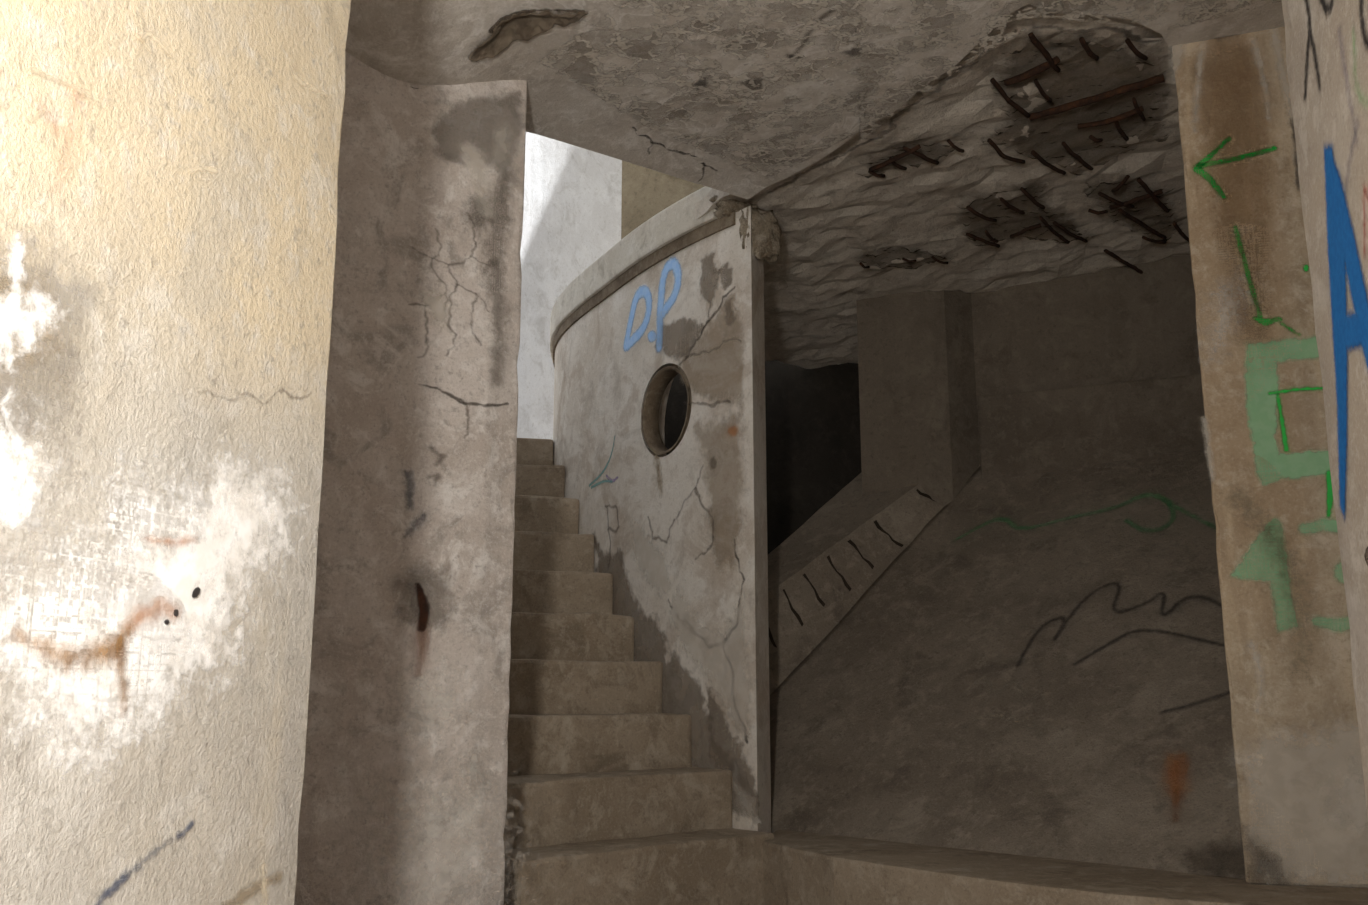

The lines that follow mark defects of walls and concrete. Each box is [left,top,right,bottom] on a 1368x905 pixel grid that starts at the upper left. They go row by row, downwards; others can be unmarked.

spalling [468,9,588,62]
spalling [966,187,1088,248]
spalling [1088,175,1189,244]
spalling [1104,249,1143,274]
crack [680,287,735,364]
crack [430,387,508,406]
damp [0,452,303,772]
rust [48,627,130,690]
damp [592,534,758,819]